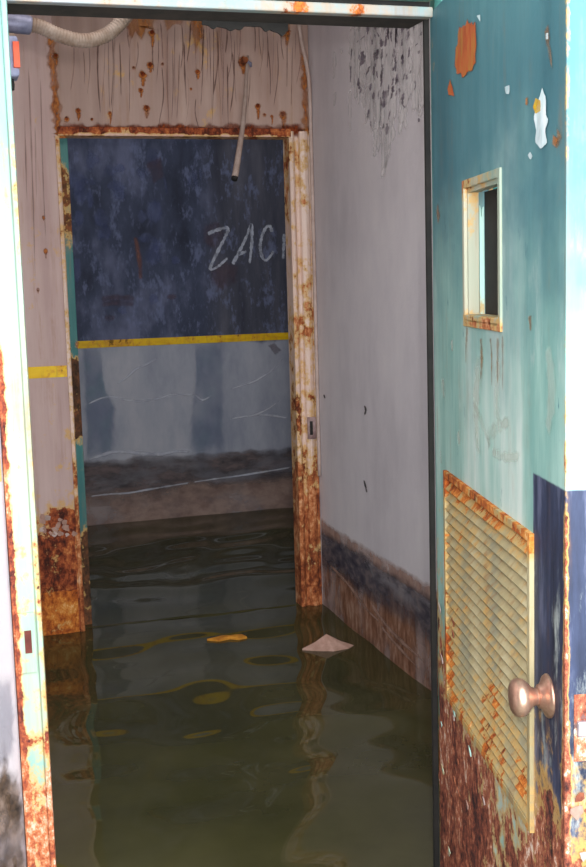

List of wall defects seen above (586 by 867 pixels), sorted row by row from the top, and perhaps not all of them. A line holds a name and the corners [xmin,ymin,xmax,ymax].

rust [128,19,155,47]
rust [48,39,309,138]
rust [447,20,476,96]
peeling [528,88,548,159]
leakage [321,521,438,696]
leakage [0,767,24,867]